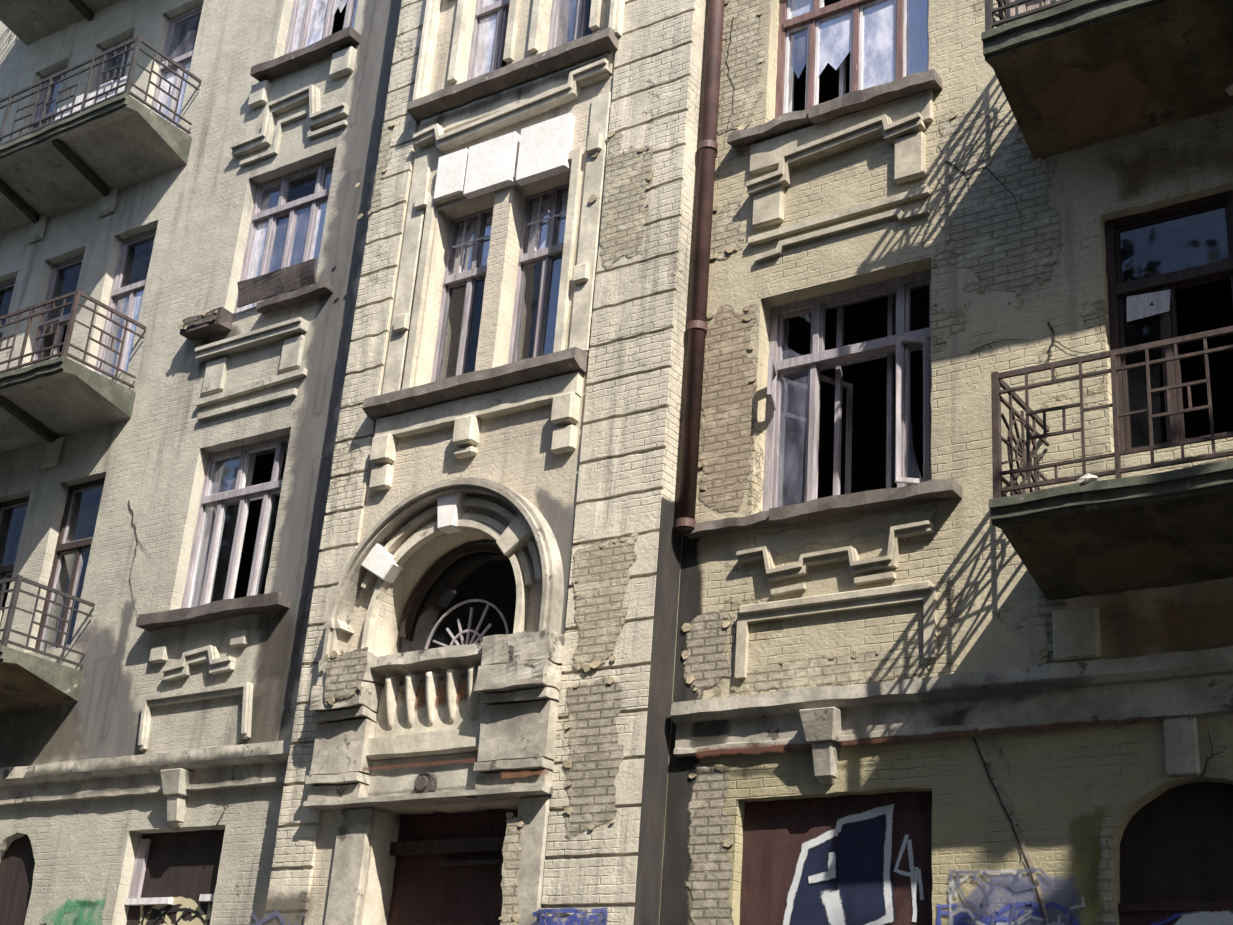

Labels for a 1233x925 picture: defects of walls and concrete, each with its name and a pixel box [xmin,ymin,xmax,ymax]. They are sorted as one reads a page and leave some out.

spalling [717,0,766,134]
spalling [710,195,746,261]
crack [945,153,1024,225]
spalling [936,109,1063,310]
leakage [0,0,402,781]
crack [970,322,1089,378]
crack [128,500,151,613]
spalling [323,647,368,705]
spalling [563,531,638,839]
spalling [681,612,935,698]
spalling [499,812,524,925]
spalling [685,763,734,925]